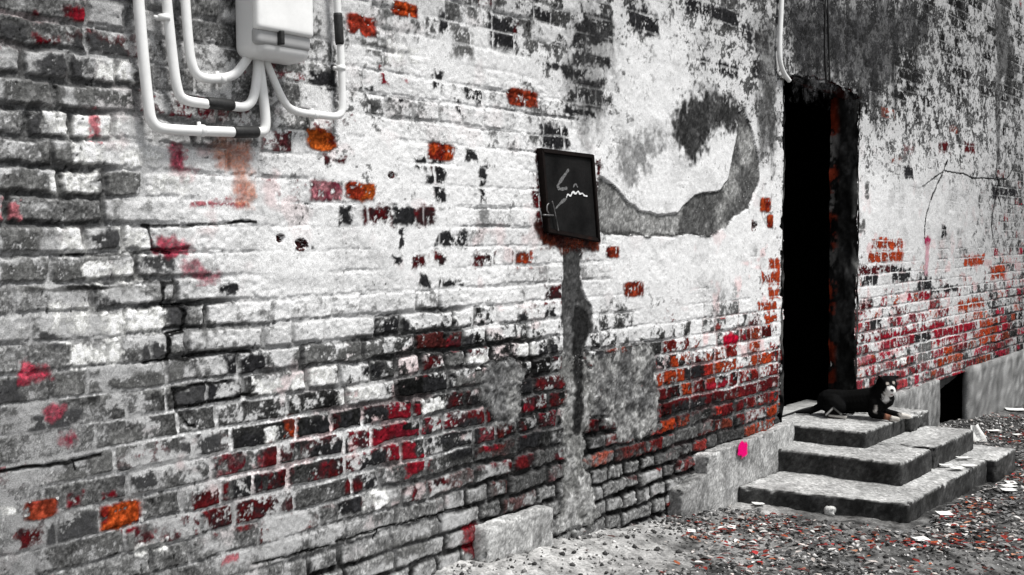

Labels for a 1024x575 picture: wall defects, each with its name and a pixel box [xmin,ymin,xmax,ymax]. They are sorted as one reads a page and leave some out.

peeling [507,87,539,108]
water stain [785,0,934,123]
water stain [994,0,1017,162]
crack [141,220,257,255]
water stain [618,130,662,186]
crack [922,149,1017,239]
crack [31,280,258,427]
crack [0,453,102,473]